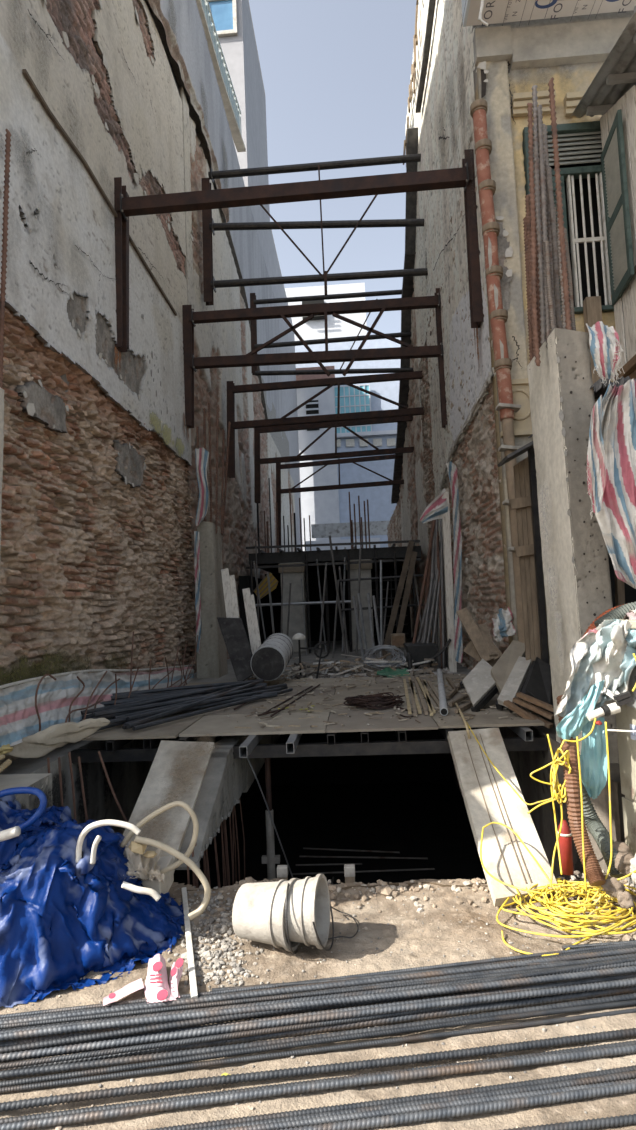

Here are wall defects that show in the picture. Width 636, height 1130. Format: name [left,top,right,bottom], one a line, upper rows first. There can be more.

peeling [44,0,163,196]
peeling [156,213,202,275]
peeling [23,390,35,416]
spalling [67,292,175,433]